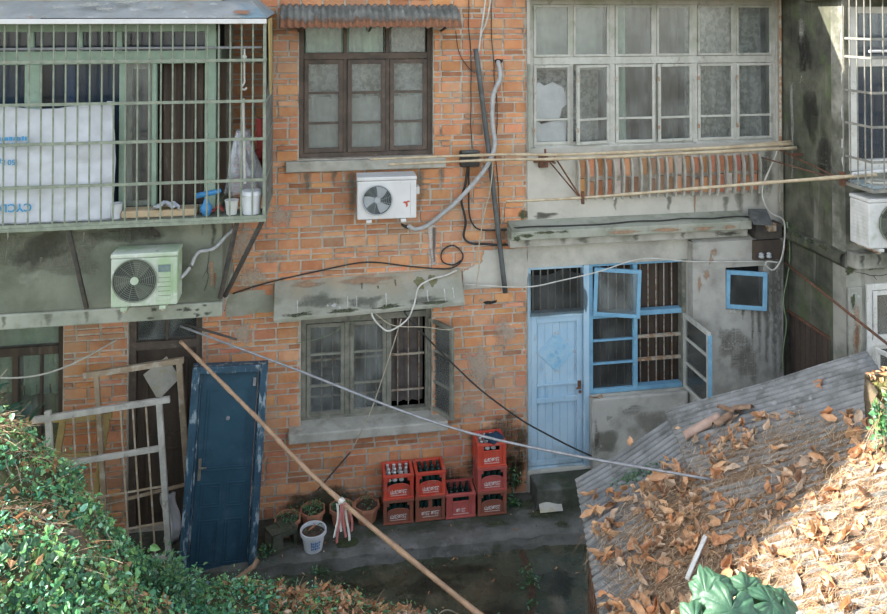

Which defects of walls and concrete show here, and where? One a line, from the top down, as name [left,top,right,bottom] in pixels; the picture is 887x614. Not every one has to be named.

water stain [799,21,811,70]
water stain [790,86,831,175]
water stain [297,283,387,312]